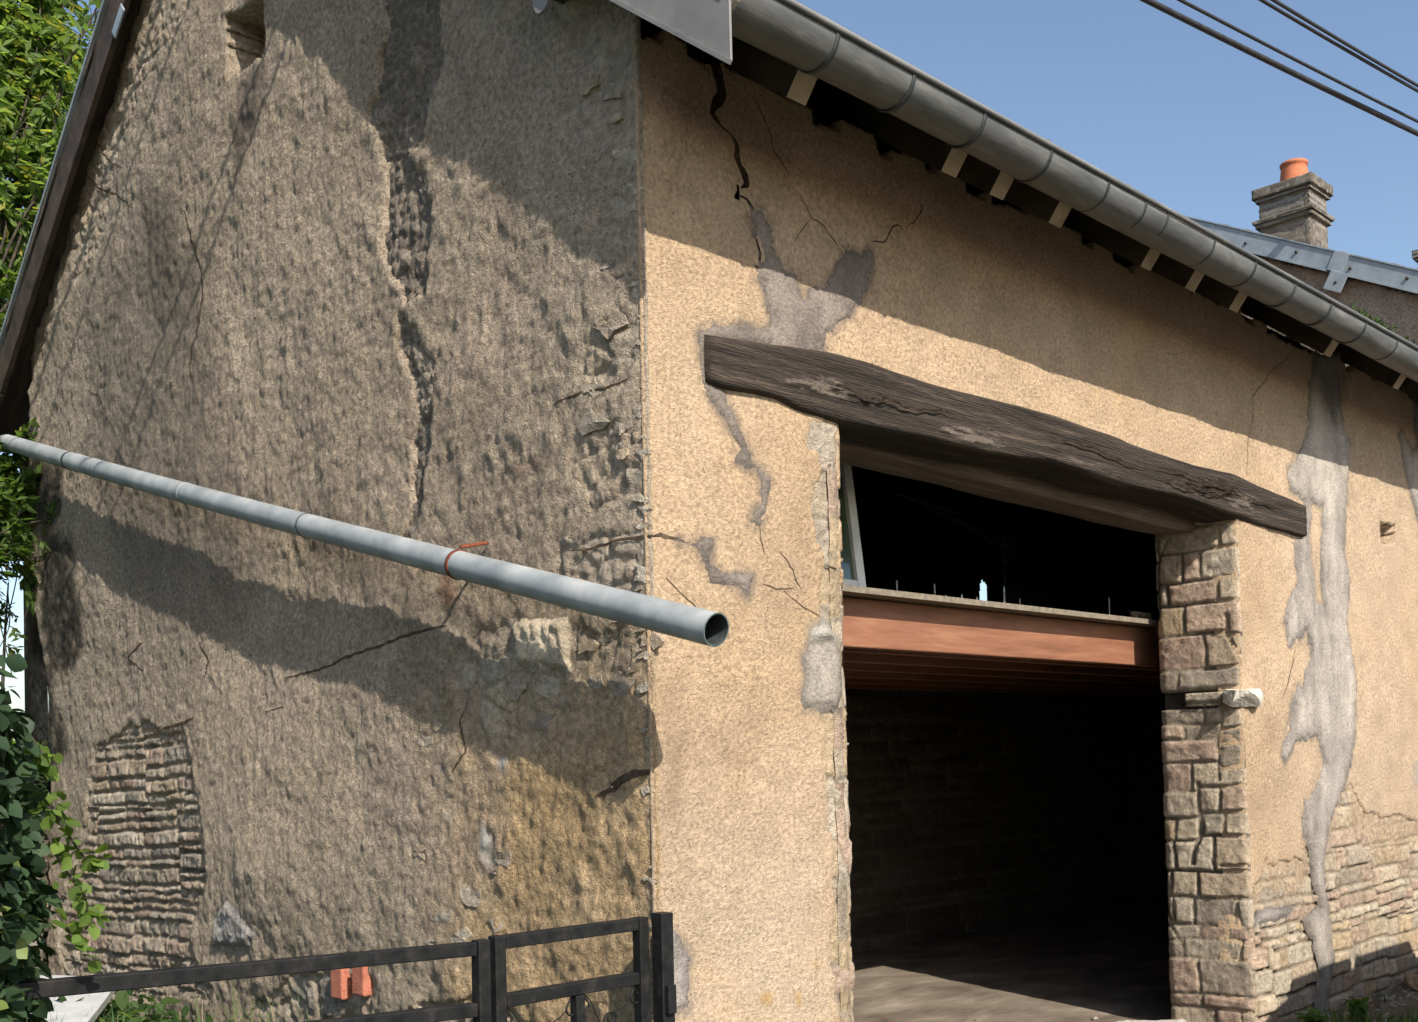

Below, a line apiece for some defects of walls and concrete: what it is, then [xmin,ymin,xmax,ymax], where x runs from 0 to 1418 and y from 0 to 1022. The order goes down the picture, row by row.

crack [705,63,923,266]
crack [128,642,143,672]
crack [266,625,445,712]
crack [147,717,194,733]
crack [452,701,467,772]
flaking render [807,420,855,1022]
flaking render [60,722,207,976]
flaking render [1240,784,1418,1022]
flaking render [108,983,213,1006]